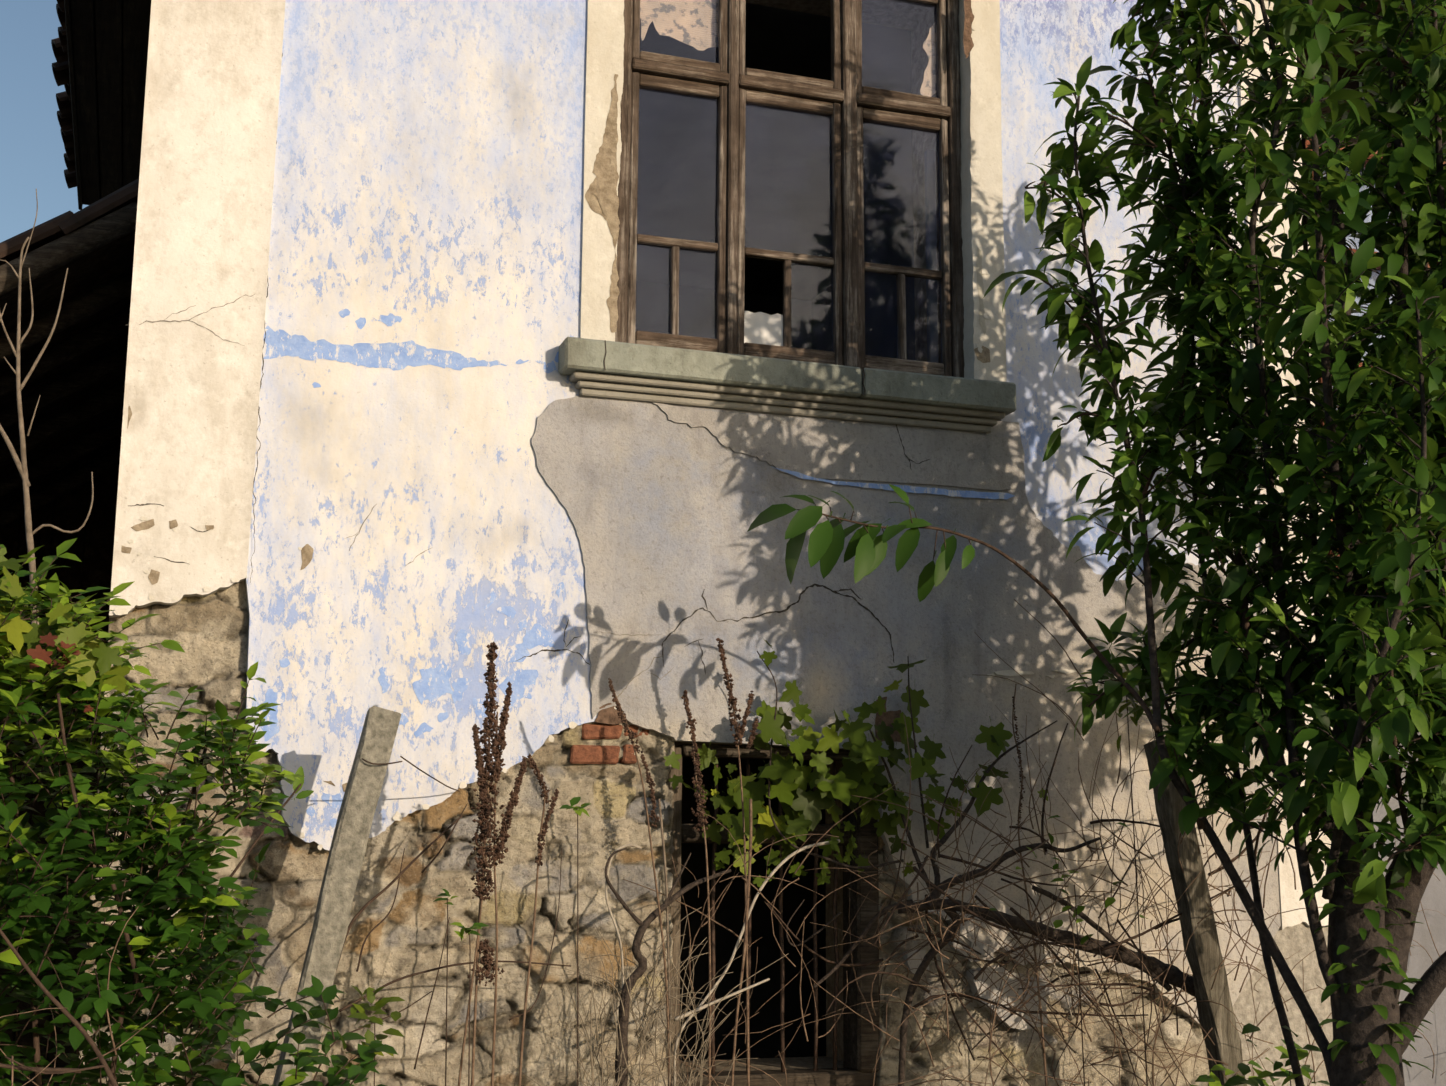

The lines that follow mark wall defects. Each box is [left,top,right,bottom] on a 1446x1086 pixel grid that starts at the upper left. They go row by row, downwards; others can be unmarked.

flaking render [585,74,620,333]
crack [139,278,269,583]
spalling [121,517,178,600]
flaking render [113,606,128,615]
crack [517,584,894,698]
peeling [378,666,390,693]
flaking render [987,669,1077,681]
flaking render [568,703,649,764]
peeling [306,806,337,828]